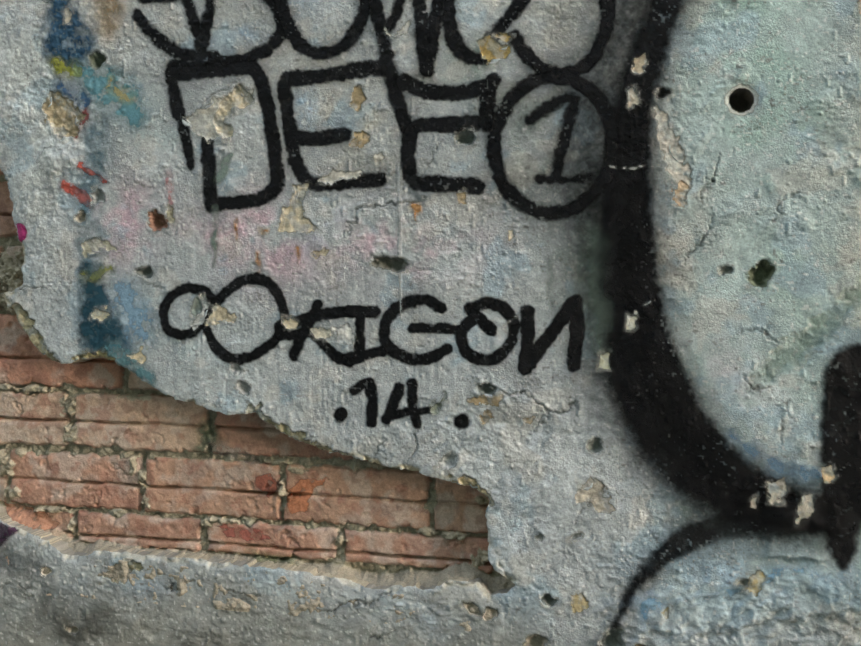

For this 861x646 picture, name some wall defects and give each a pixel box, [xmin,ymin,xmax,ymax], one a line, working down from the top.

peeling [42,91,86,140]
spalling [148,204,175,232]
peeling [278,168,362,234]
spalling [136,267,153,278]
spalling [371,256,408,275]
peeling [11,303,60,362]
peeling [91,306,110,321]
peeling [191,294,237,331]
peeling [283,315,298,329]
peeling [310,323,354,347]
peeling [236,381,348,455]
peeling [467,383,503,424]